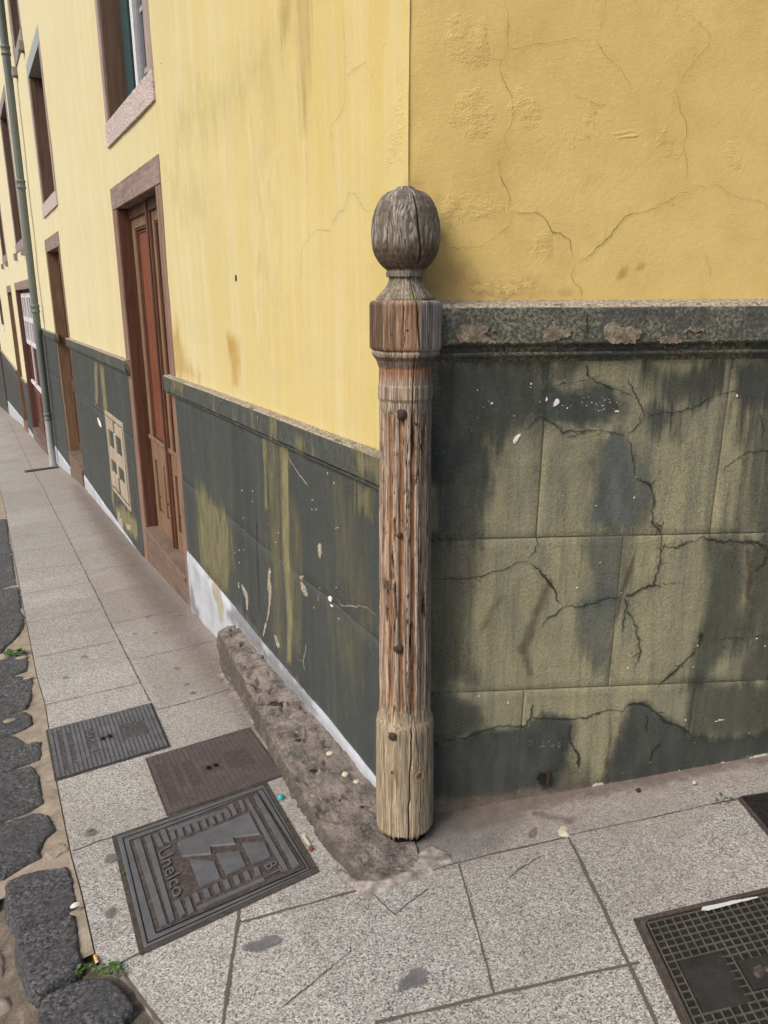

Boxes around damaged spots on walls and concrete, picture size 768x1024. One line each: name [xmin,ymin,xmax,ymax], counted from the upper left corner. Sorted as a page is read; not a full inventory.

peeling [455,324,508,344]
peeling [542,321,573,343]
crack [439,7,768,665]
peeling [603,321,642,345]
peeling [660,326,722,344]
water stain [196,485,233,590]
water stain [431,362,621,800]
water stain [580,435,653,663]
water stain [604,360,768,784]
crack [449,633,765,768]